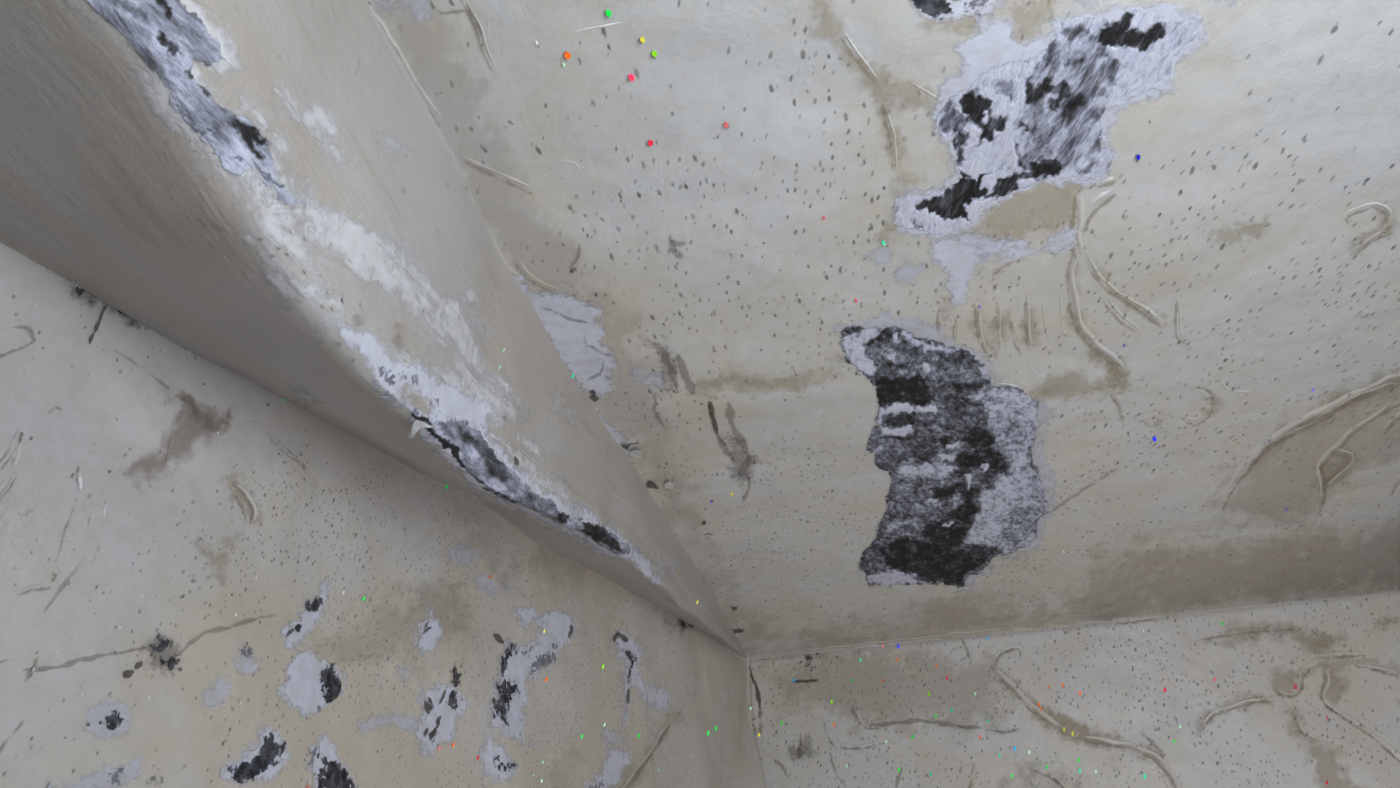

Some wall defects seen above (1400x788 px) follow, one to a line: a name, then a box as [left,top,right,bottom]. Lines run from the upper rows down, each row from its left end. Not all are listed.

spalling [867,0,1209,306]
spalling [67,0,677,586]
spalling [836,314,1055,593]
spalling [221,727,355,788]
spalling [277,580,347,717]
spalling [361,665,470,757]
spalling [480,606,575,784]
spalling [583,627,671,788]